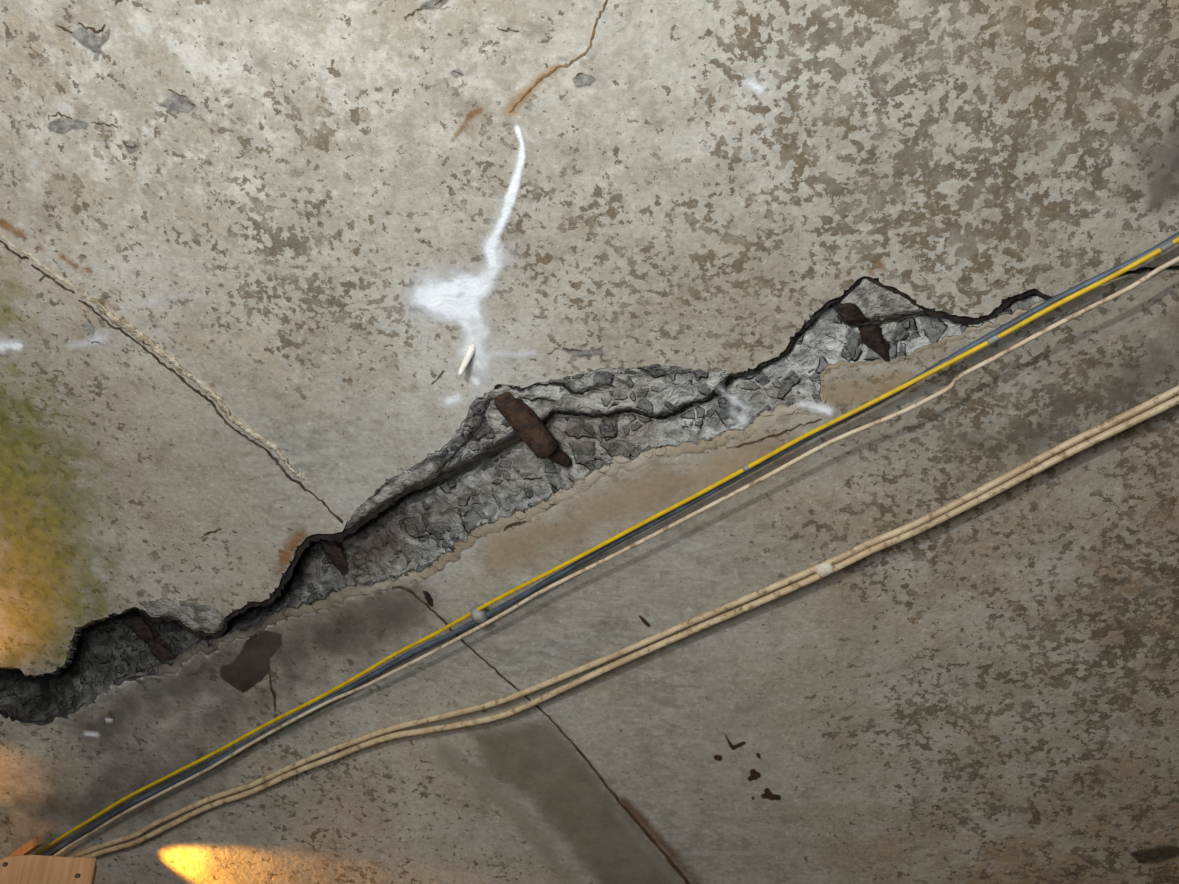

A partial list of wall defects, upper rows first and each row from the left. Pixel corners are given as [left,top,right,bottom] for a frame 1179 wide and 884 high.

crack [508,0,607,113]
damp [411,125,536,386]
crack [1101,265,1179,287]
spalling [547,345,603,356]
rust [835,300,890,361]
damp [446,394,461,405]
crack [0,232,1058,884]
rust [122,615,175,662]